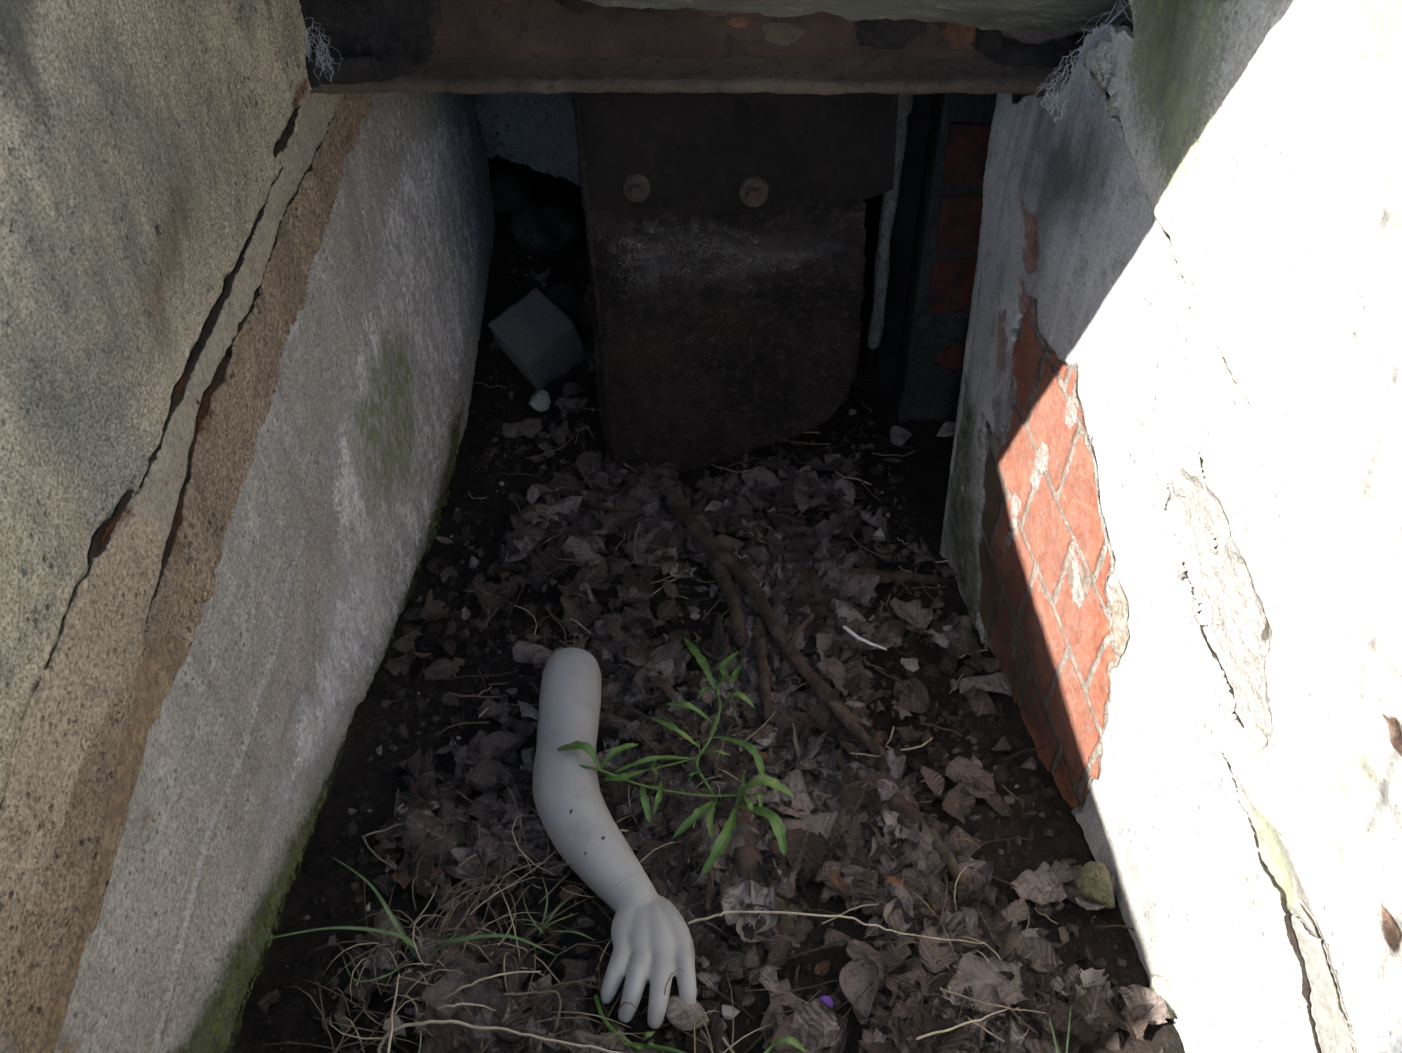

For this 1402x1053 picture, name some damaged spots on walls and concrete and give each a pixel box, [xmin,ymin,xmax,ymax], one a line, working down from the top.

corrosion [854,18,977,49]
crack [0,79,334,810]
water stain [268,102,482,832]
flaking render [974,202,1130,814]
spalling [1158,438,1272,753]
crack [1219,747,1357,1053]